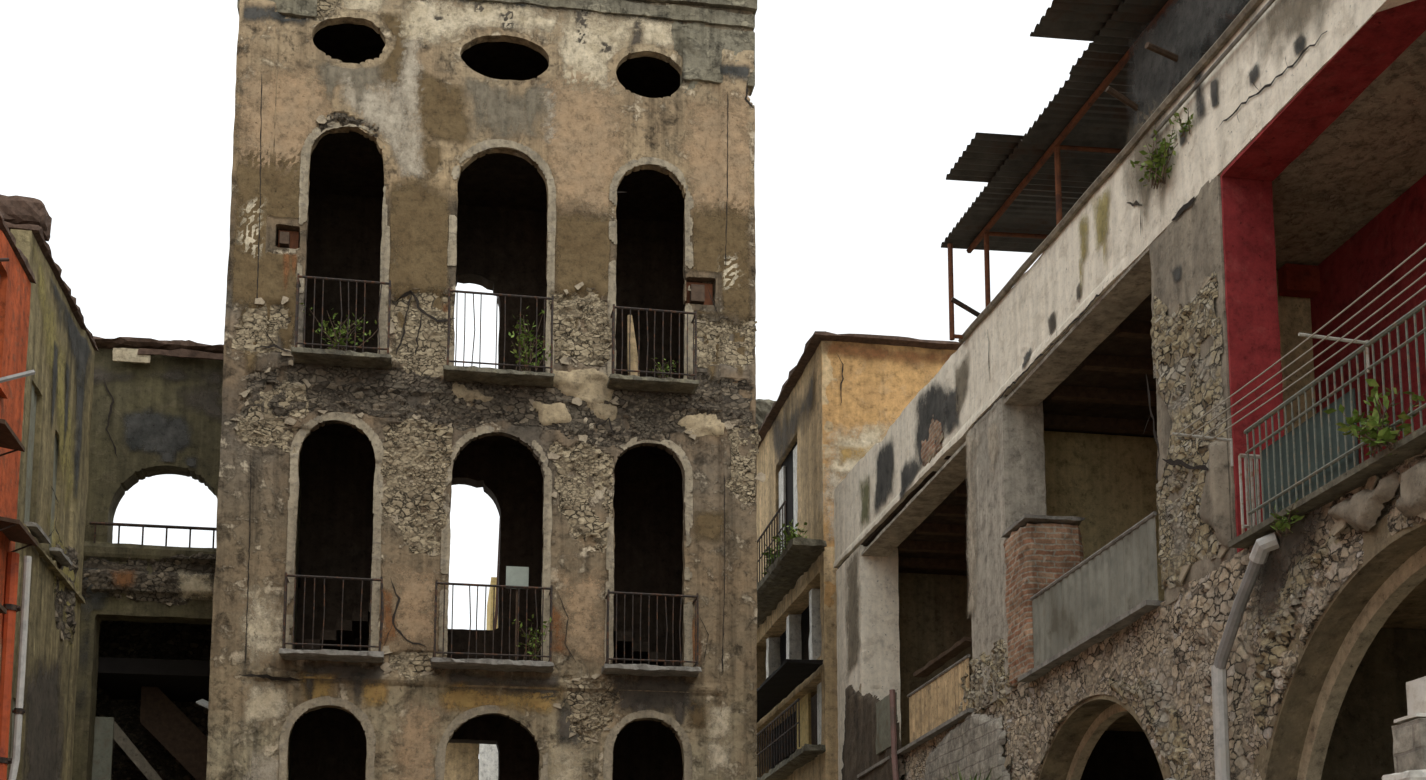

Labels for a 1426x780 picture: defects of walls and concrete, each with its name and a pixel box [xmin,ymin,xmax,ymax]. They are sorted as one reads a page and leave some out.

spalling [231,282,766,680]
spalling [1150,271,1231,589]
peeling [708,707,731,769]